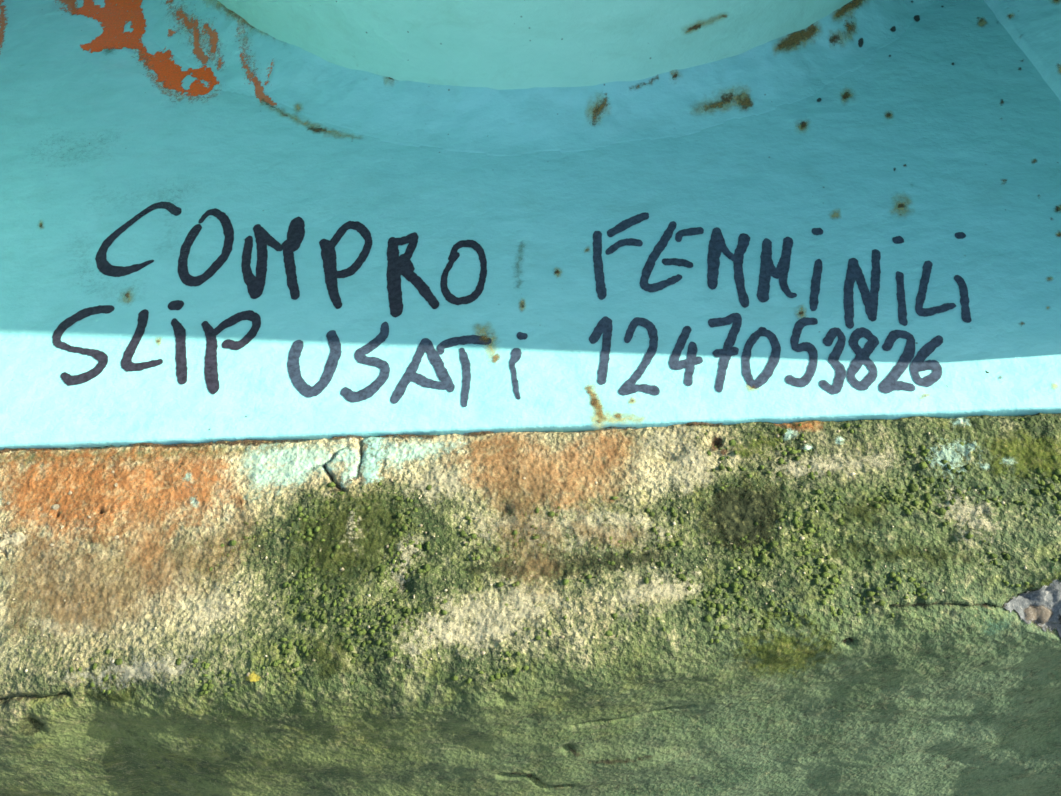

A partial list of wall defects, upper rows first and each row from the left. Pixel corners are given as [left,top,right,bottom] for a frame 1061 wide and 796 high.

peeling [0,0,8,52]
peeling [53,0,225,102]
corrosion [775,24,819,51]
corrosion [830,0,864,43]
corrosion [590,93,608,125]
corrosion [703,92,753,111]
water stain [336,437,470,509]
water stain [772,446,896,476]
corrosion [0,445,243,569]
water stain [938,487,999,544]
water stain [393,498,701,668]
water stain [64,652,194,690]